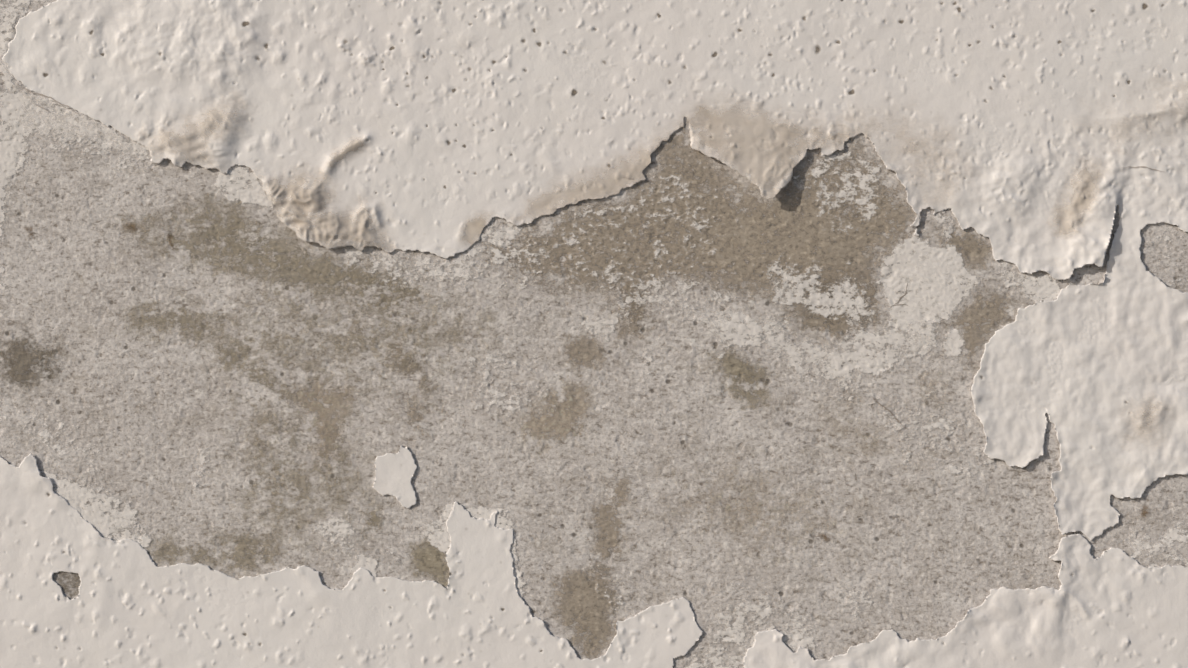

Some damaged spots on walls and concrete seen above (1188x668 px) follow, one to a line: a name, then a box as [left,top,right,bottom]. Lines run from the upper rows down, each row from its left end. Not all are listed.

peeling [22,102,51,132]
leakage [163,200,417,306]
leakage [270,178,381,246]
peeling [657,175,691,203]
leakage [492,108,910,337]
peeling [815,175,836,217]
peeling [1140,223,1188,293]
leakage [954,295,1011,354]
peeling [1085,474,1188,568]
peeling [53,571,81,600]
leakage [412,539,450,586]
leakage [553,479,629,657]